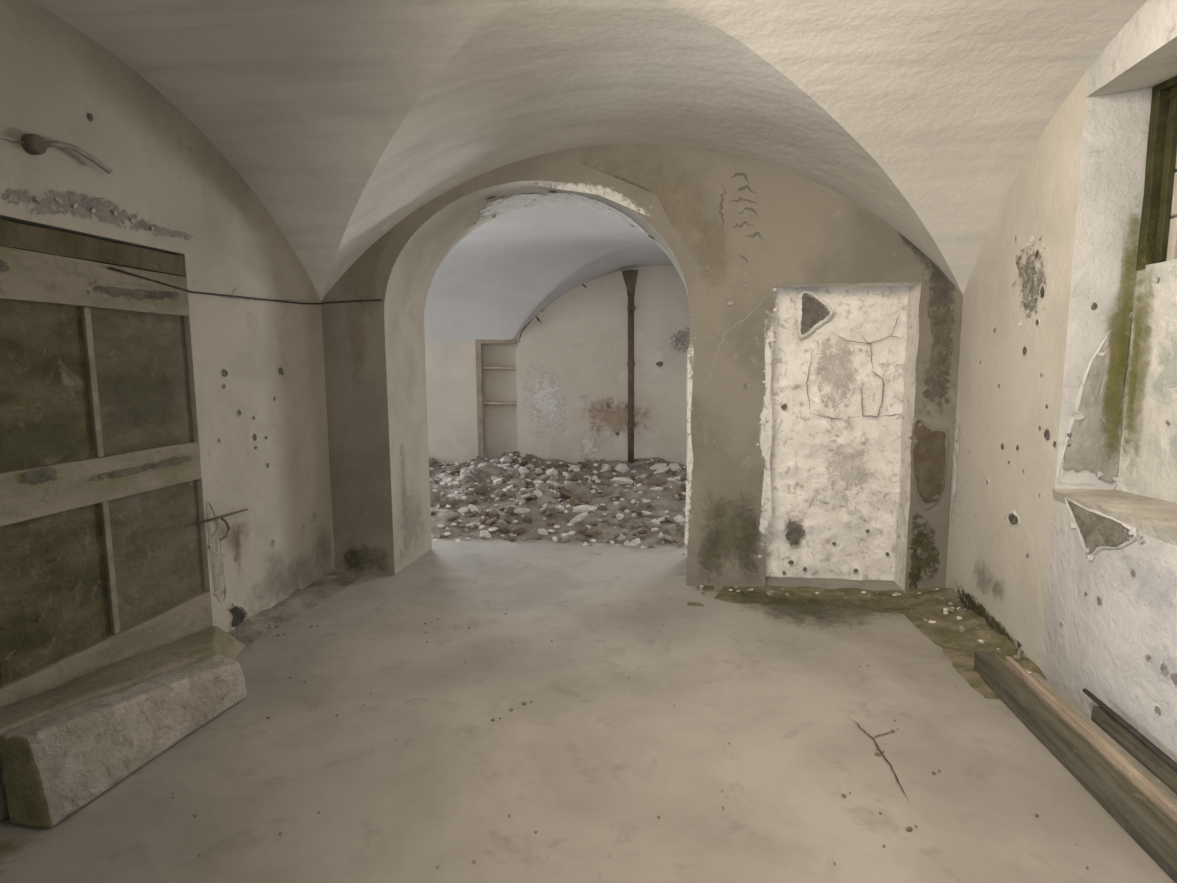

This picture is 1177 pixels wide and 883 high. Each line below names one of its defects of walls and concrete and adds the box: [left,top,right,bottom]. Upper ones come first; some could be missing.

peeling [2,189,191,240]
spalling [1012,234,1047,327]
leakage [1107,248,1140,438]
spalling [1145,652,1177,689]